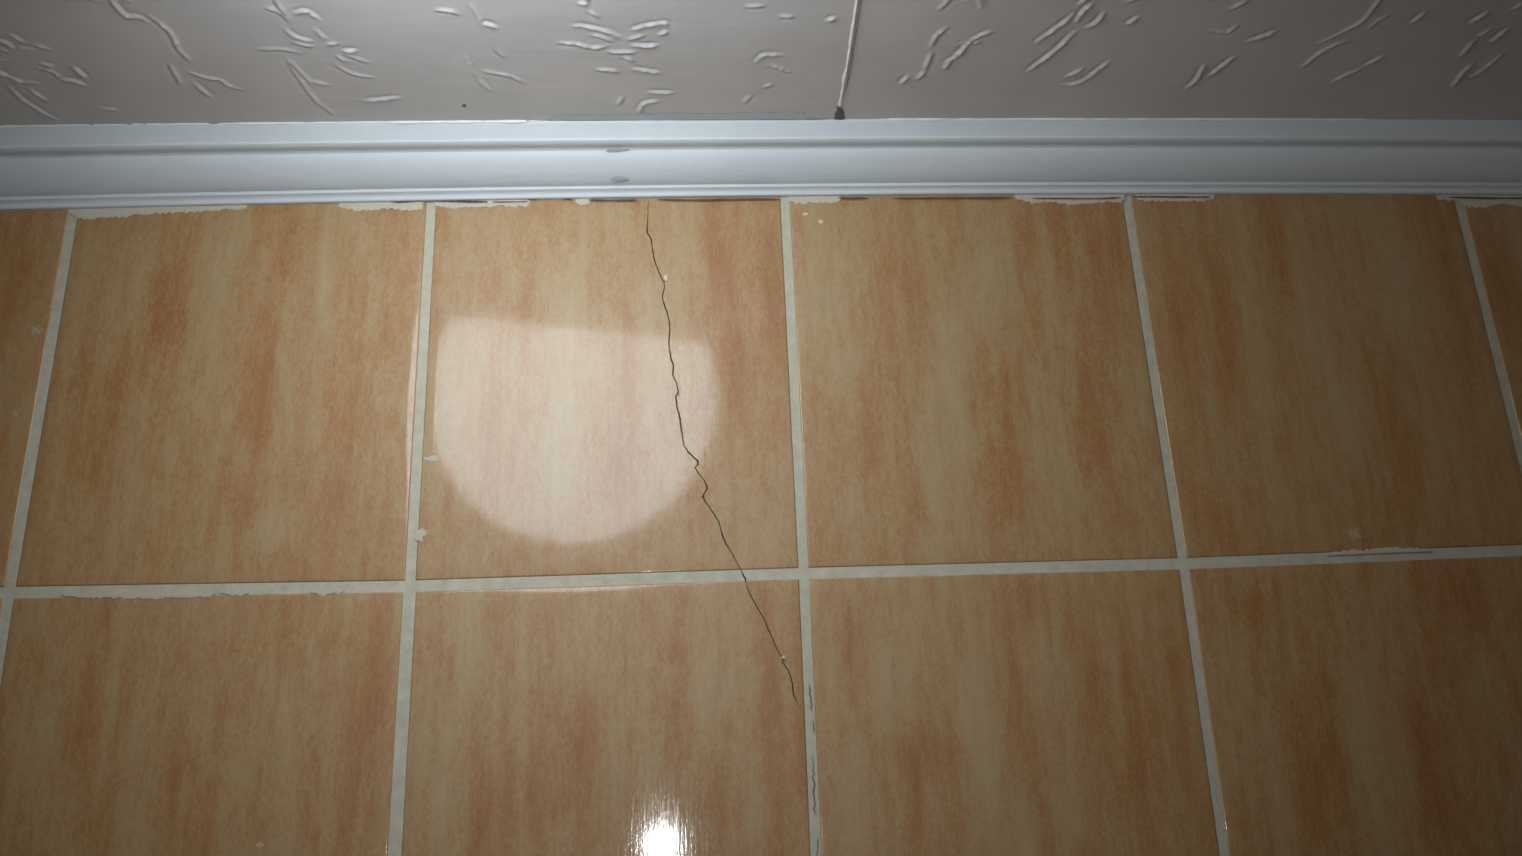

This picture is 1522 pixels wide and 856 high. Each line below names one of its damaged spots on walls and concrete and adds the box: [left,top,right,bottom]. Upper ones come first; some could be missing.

crack [646,209,818,856]